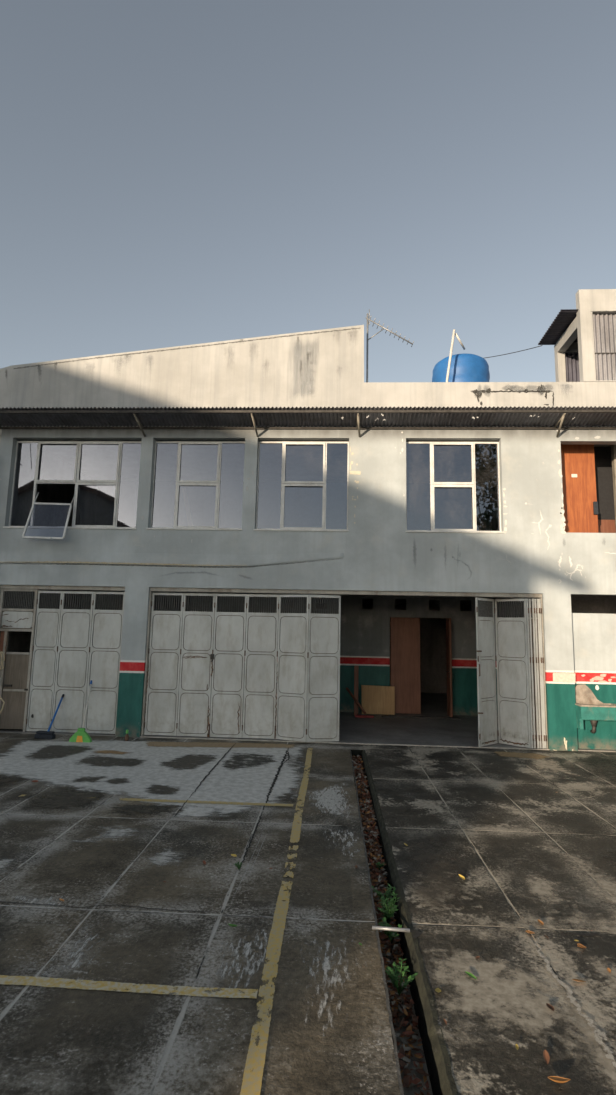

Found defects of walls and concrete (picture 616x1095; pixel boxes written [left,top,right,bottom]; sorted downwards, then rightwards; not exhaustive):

crack [511,462,583,583]
peeling [553,673,616,690]